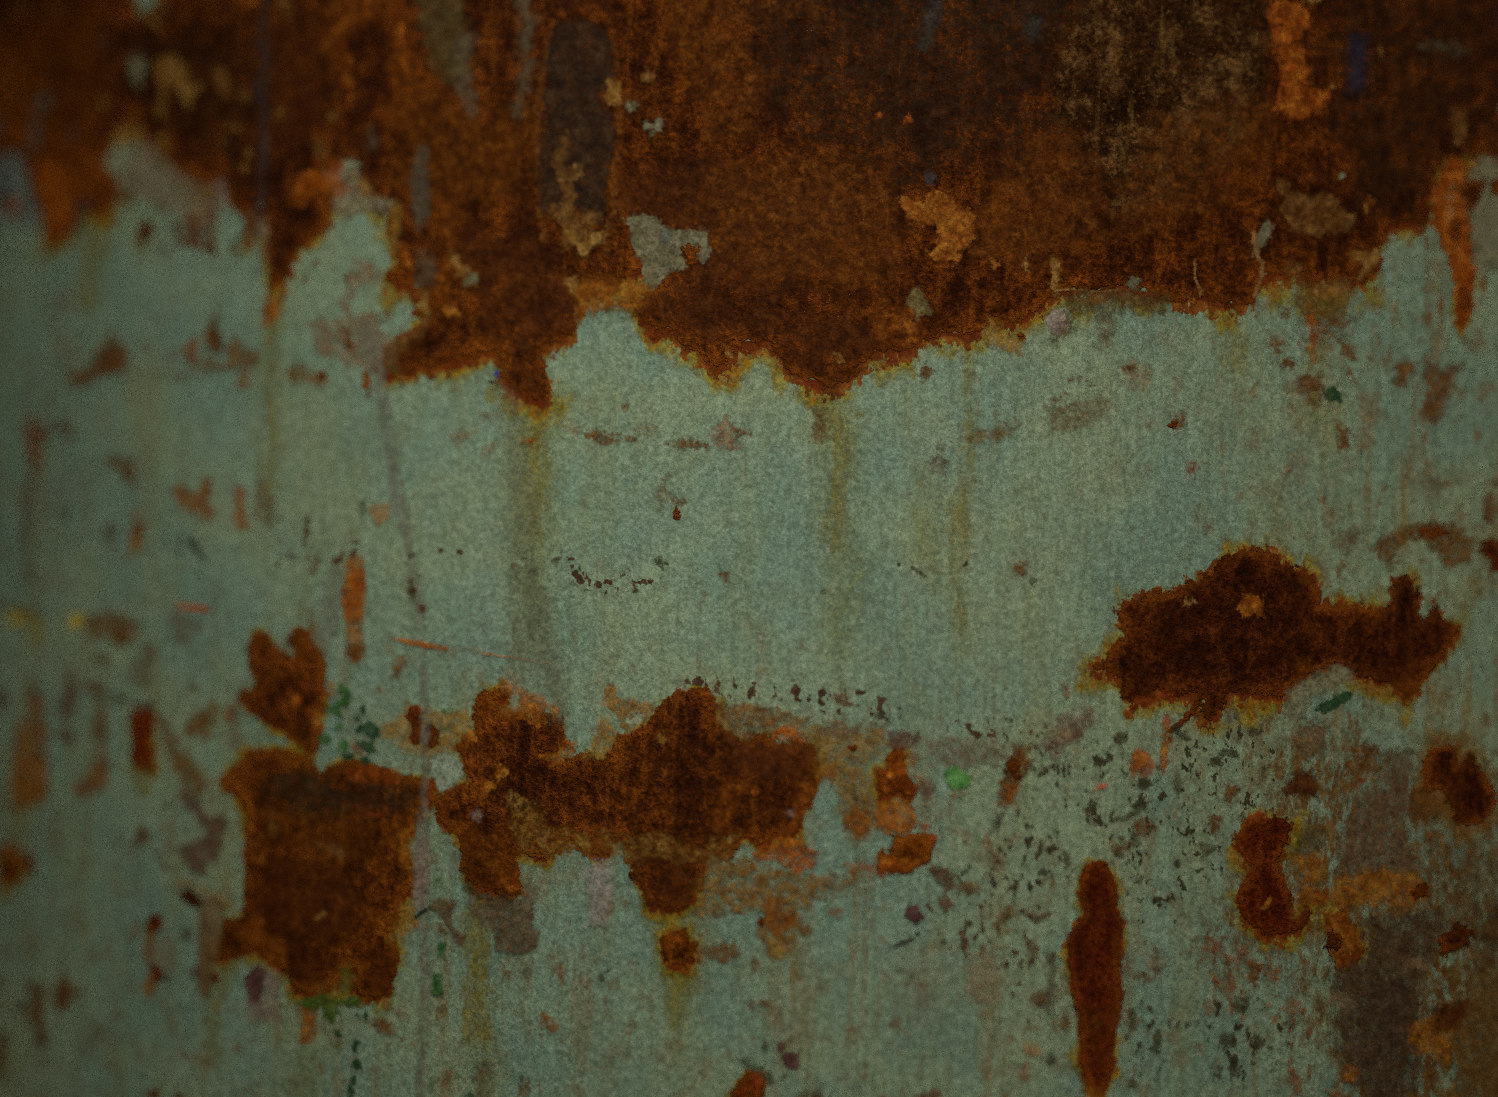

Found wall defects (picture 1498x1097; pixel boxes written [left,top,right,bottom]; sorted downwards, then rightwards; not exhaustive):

corrosion [0,0,1498,444]
corrosion [678,414,752,450]
corrosion [1336,425,1351,450]
corrosion [658,480,686,520]
corrosion [1062,481,1498,788]
corrosion [0,837,37,902]
corrosion [111,625,1035,1034]
corrosion [1409,732,1498,838]
corrosion [1020,857,1160,1097]
corrosion [1198,772,1430,1097]
corrosion [1435,920,1476,957]
corrosion [726,1059,775,1097]